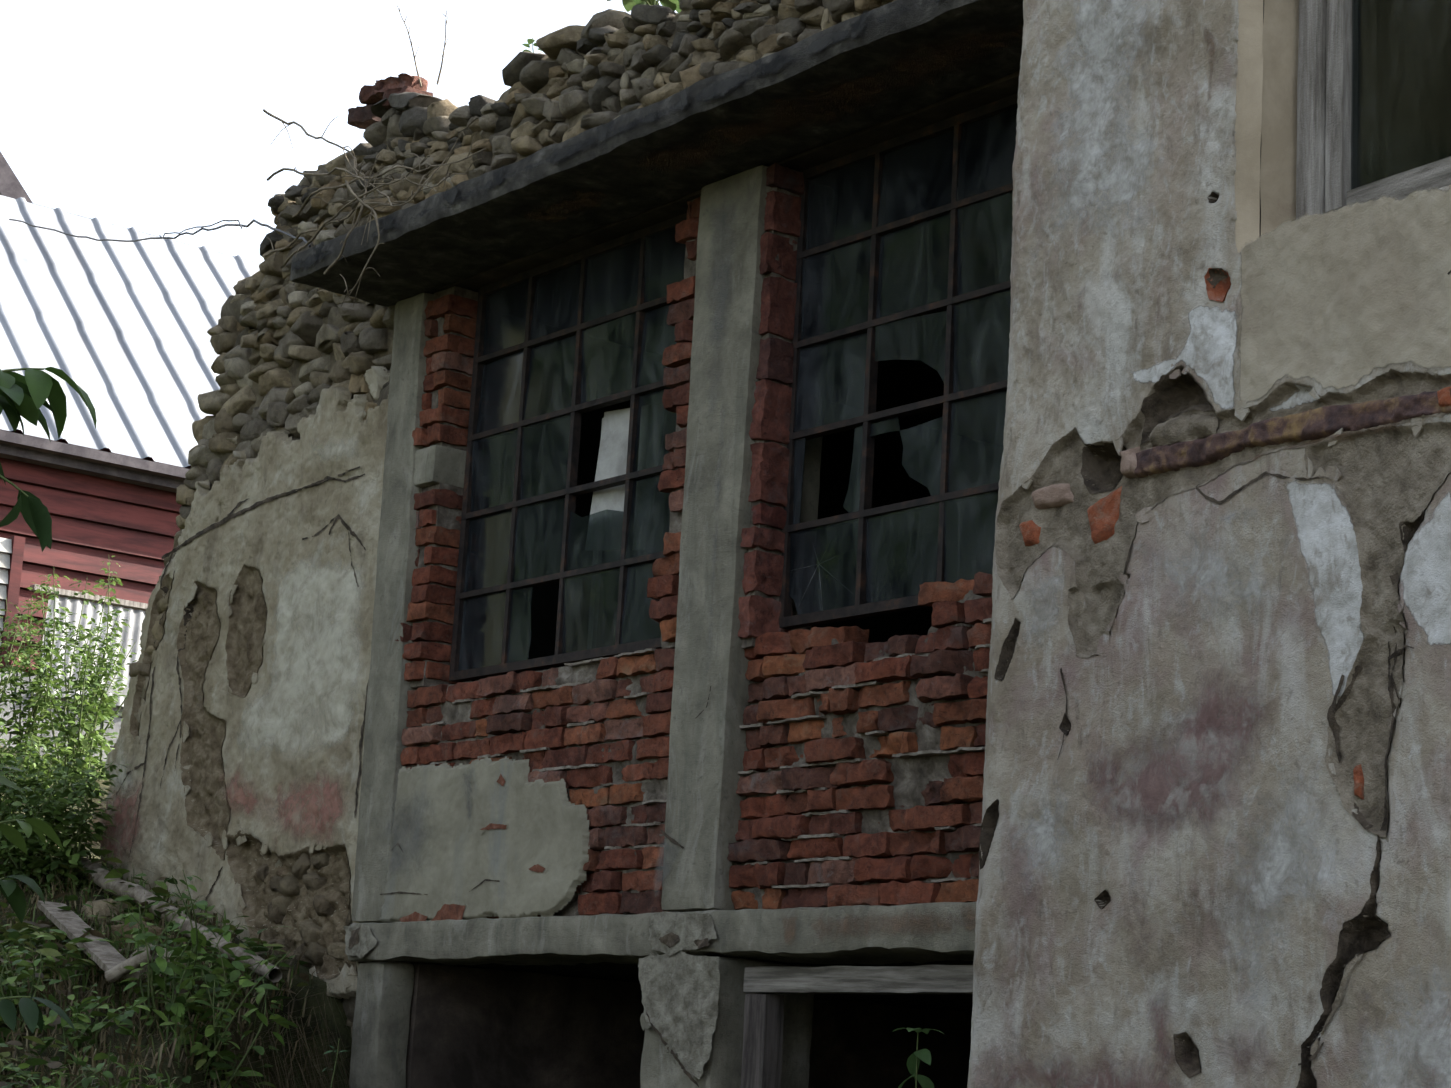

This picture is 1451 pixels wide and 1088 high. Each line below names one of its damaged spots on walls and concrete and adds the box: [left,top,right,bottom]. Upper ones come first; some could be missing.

rust [1134,389,1451,478]
spalling [995,268,1451,838]
crack [116,466,366,856]
peeling [118,563,377,991]
crack [354,680,369,818]
spalling [399,902,468,922]
spalling [479,823,510,835]
spalling [529,864,548,874]
spalling [638,911,720,1087]
crack [1296,627,1414,1088]